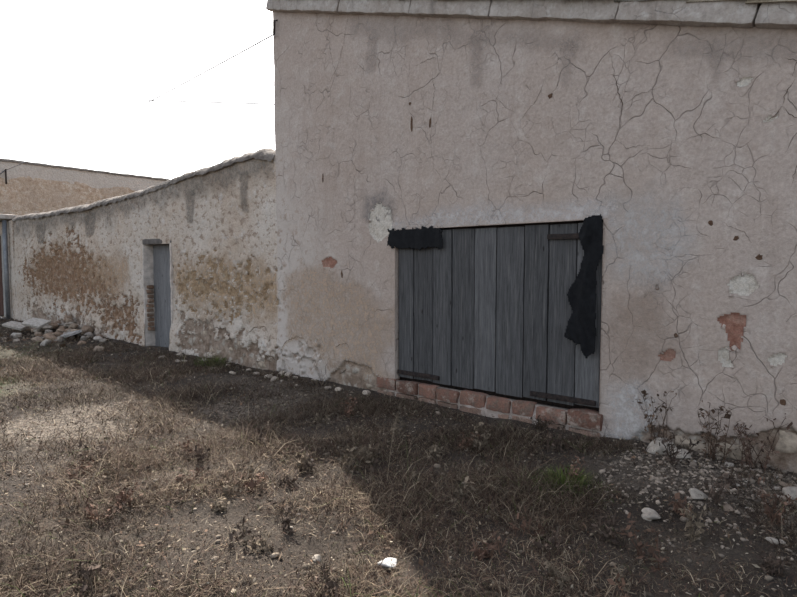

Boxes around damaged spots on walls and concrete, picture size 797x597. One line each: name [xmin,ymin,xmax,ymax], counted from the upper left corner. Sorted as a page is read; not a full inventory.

crack [609,53,655,149]
flaking render [367,202,395,242]
peeling [19,227,142,345]
flaking render [173,249,279,372]
flaking render [717,313,746,369]
flaking render [632,427,797,473]